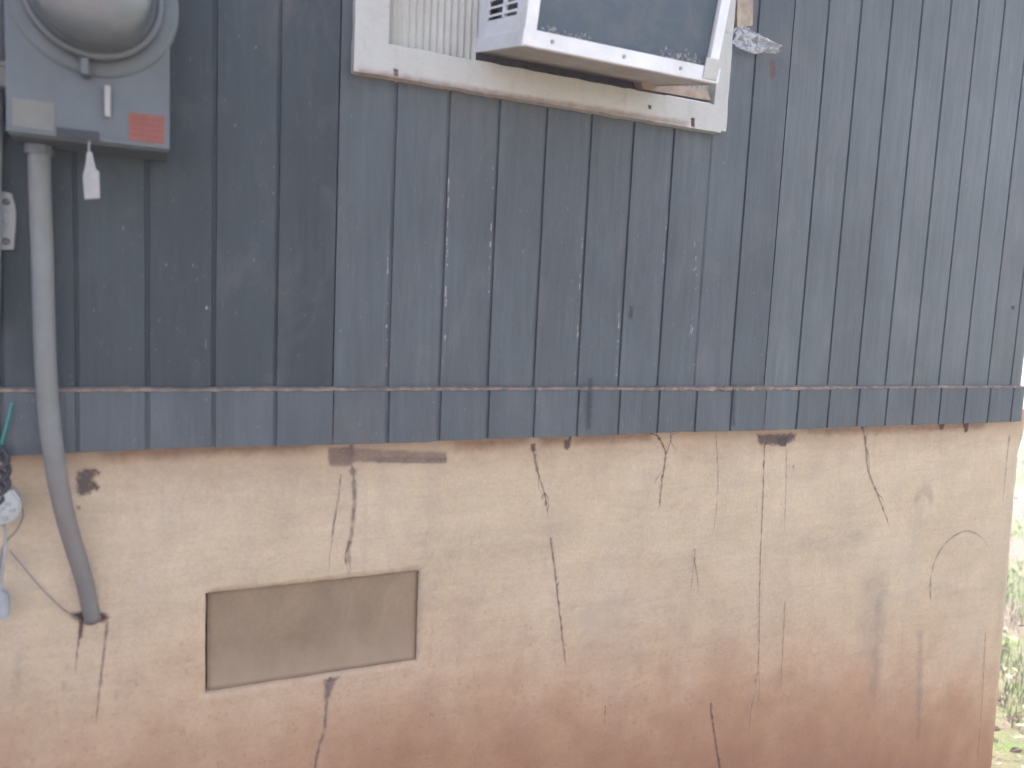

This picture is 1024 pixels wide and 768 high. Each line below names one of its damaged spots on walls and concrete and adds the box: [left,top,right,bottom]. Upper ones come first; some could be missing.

leakage [330,448,446,465]
spalling [758,434,795,446]
spalling [76,469,100,508]
crack [345,444,356,561]
crack [315,678,336,767]